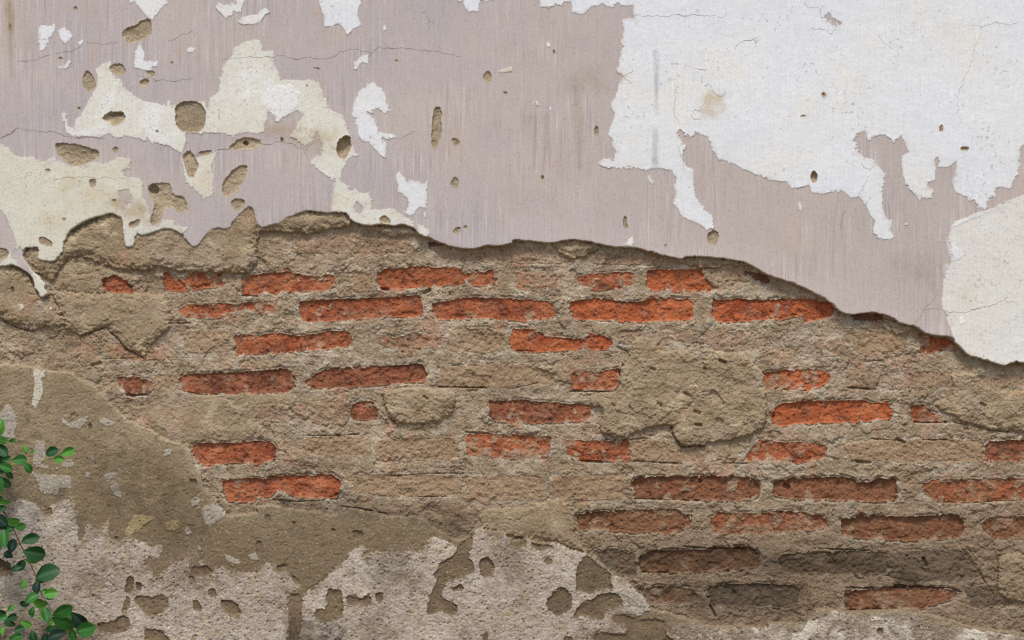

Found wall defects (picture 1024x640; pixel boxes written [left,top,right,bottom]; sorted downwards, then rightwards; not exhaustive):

peeling [38,24,83,51]
flaking render [122,0,167,87]
peeling [216,0,269,25]
peeling [318,0,361,35]
peeling [61,40,414,228]
peeling [539,0,1024,245]
spalling [0,142,1024,640]